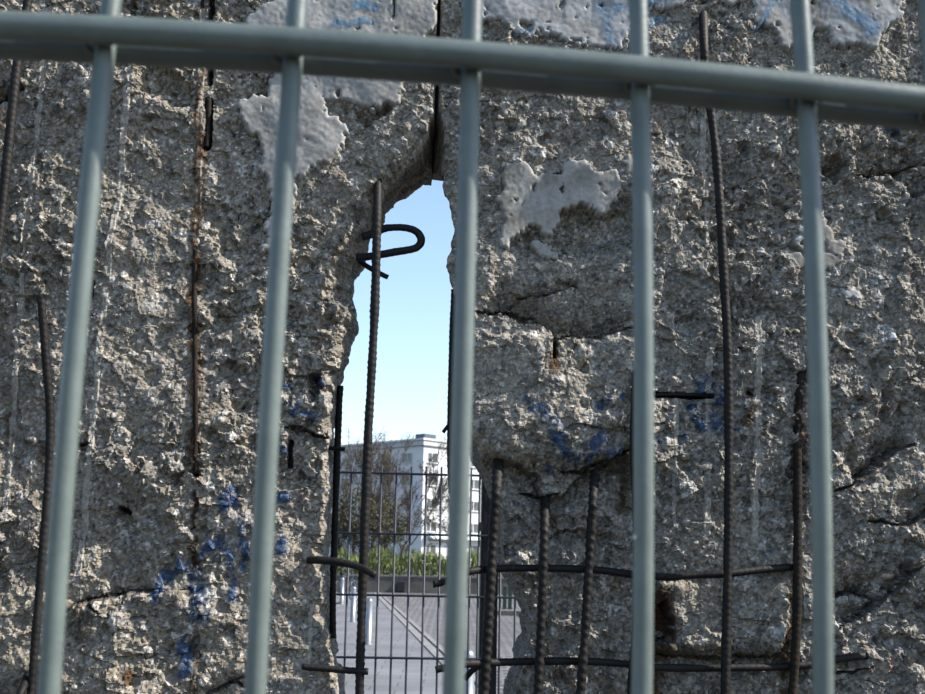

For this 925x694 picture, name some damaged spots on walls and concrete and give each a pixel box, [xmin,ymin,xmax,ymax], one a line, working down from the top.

peeling [482,0,629,51]
peeling [293,75,406,211]
peeling [484,154,632,261]
corrosion [186,70,211,474]
crack [520,290,565,300]
crack [556,327,633,340]
spalling [287,172,425,694]
spalling [442,289,454,493]
corrosion [187,491,199,579]
crack [66,587,155,615]
crack [206,675,245,694]
corrosion [653,588,676,694]